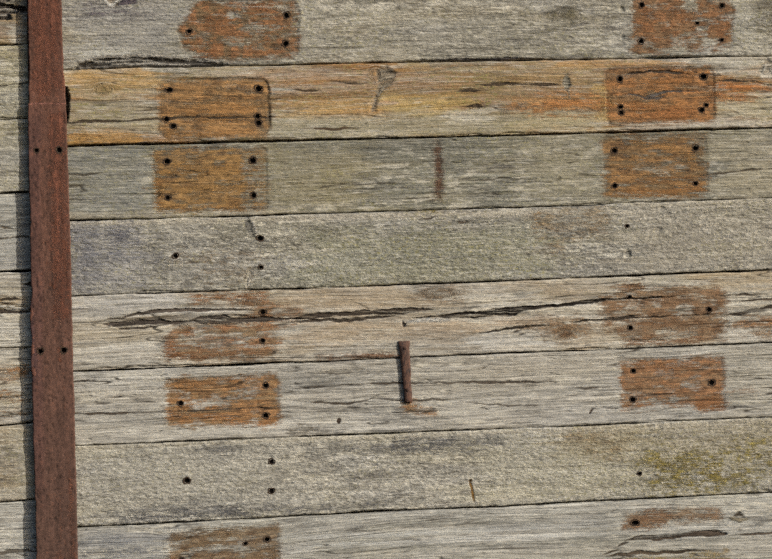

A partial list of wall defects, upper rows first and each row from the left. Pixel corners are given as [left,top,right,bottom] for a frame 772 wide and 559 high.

rust [178,0,300,61]
rust [630,0,736,56]
rust [152,77,273,213]
rust [503,67,772,199]
rust [47,109,144,318]
crack [103,297,668,333]
crack [696,293,772,316]
rust [598,283,772,411]
rust [165,373,282,430]
crack [605,530,772,559]